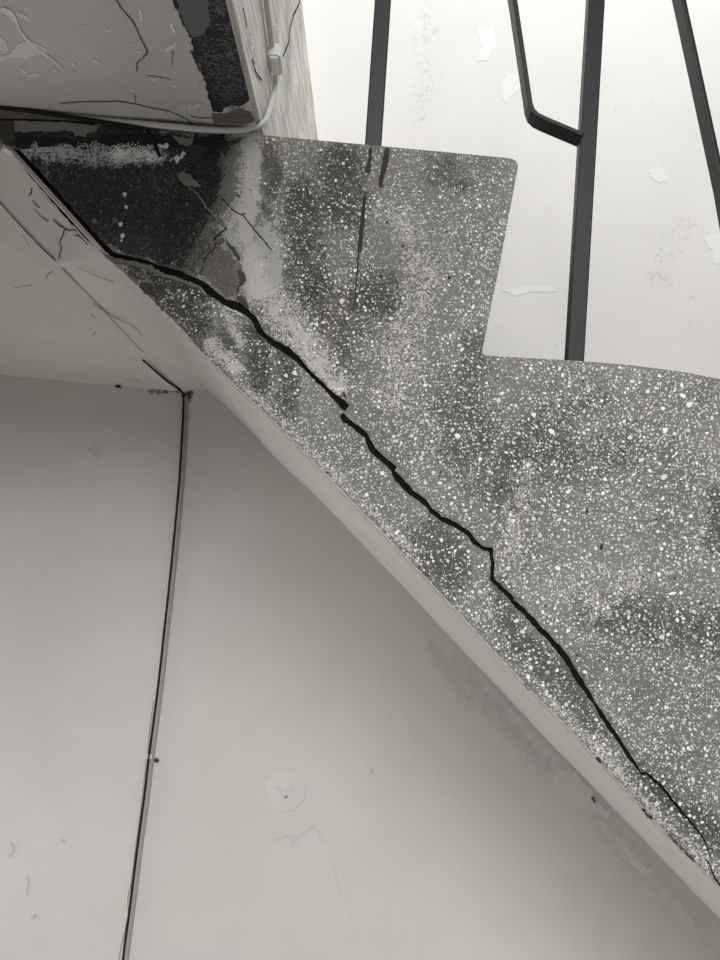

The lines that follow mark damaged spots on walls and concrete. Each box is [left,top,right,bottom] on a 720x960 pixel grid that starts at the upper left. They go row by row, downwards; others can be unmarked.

crack [0,0,214,126]
peeling [177,0,249,110]
peeling [500,73,520,104]
crack [0,149,720,888]
spalling [105,135,720,869]